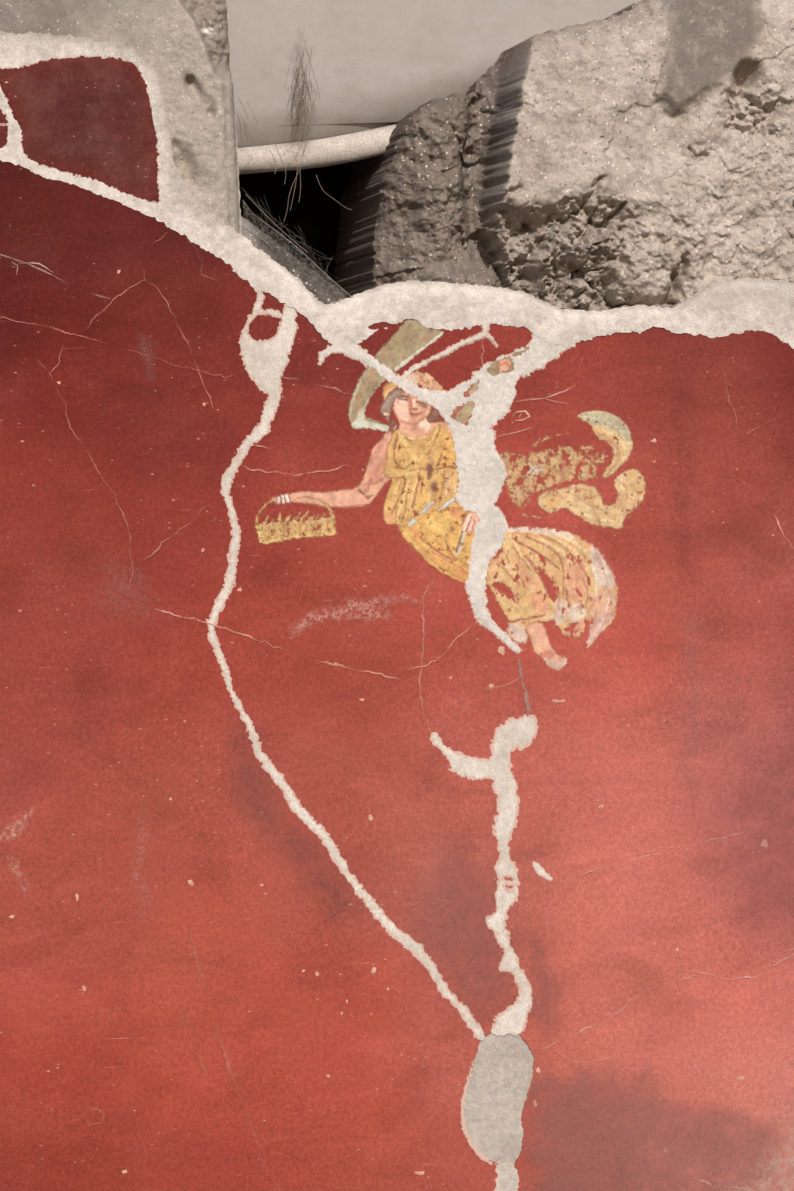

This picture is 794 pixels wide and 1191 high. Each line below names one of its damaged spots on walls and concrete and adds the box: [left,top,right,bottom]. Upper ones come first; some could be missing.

spalling [239,0,794,311]
crack [0,277,188,376]
spalling [319,335,575,655]
crack [92,291,535,1041]